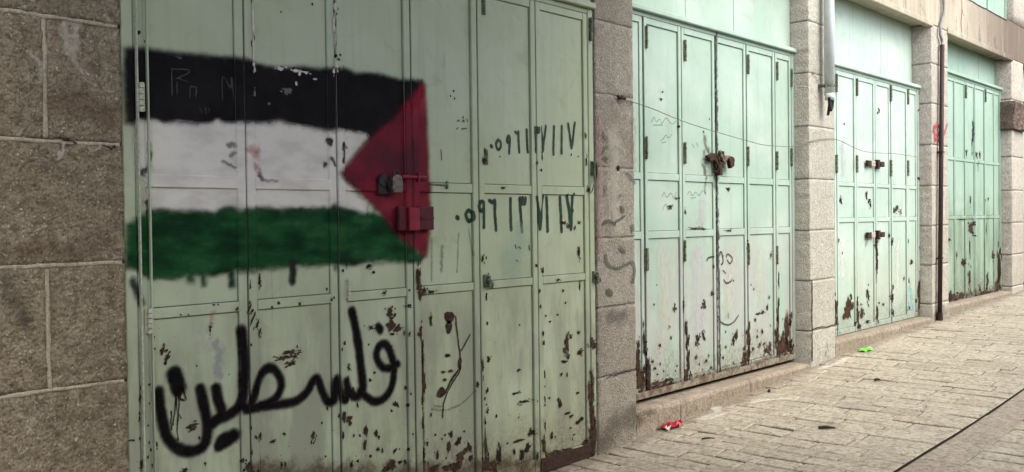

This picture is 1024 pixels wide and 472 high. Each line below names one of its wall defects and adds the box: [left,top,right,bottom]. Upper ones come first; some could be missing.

corrosion [437,312,471,418]
corrosion [638,343,786,392]